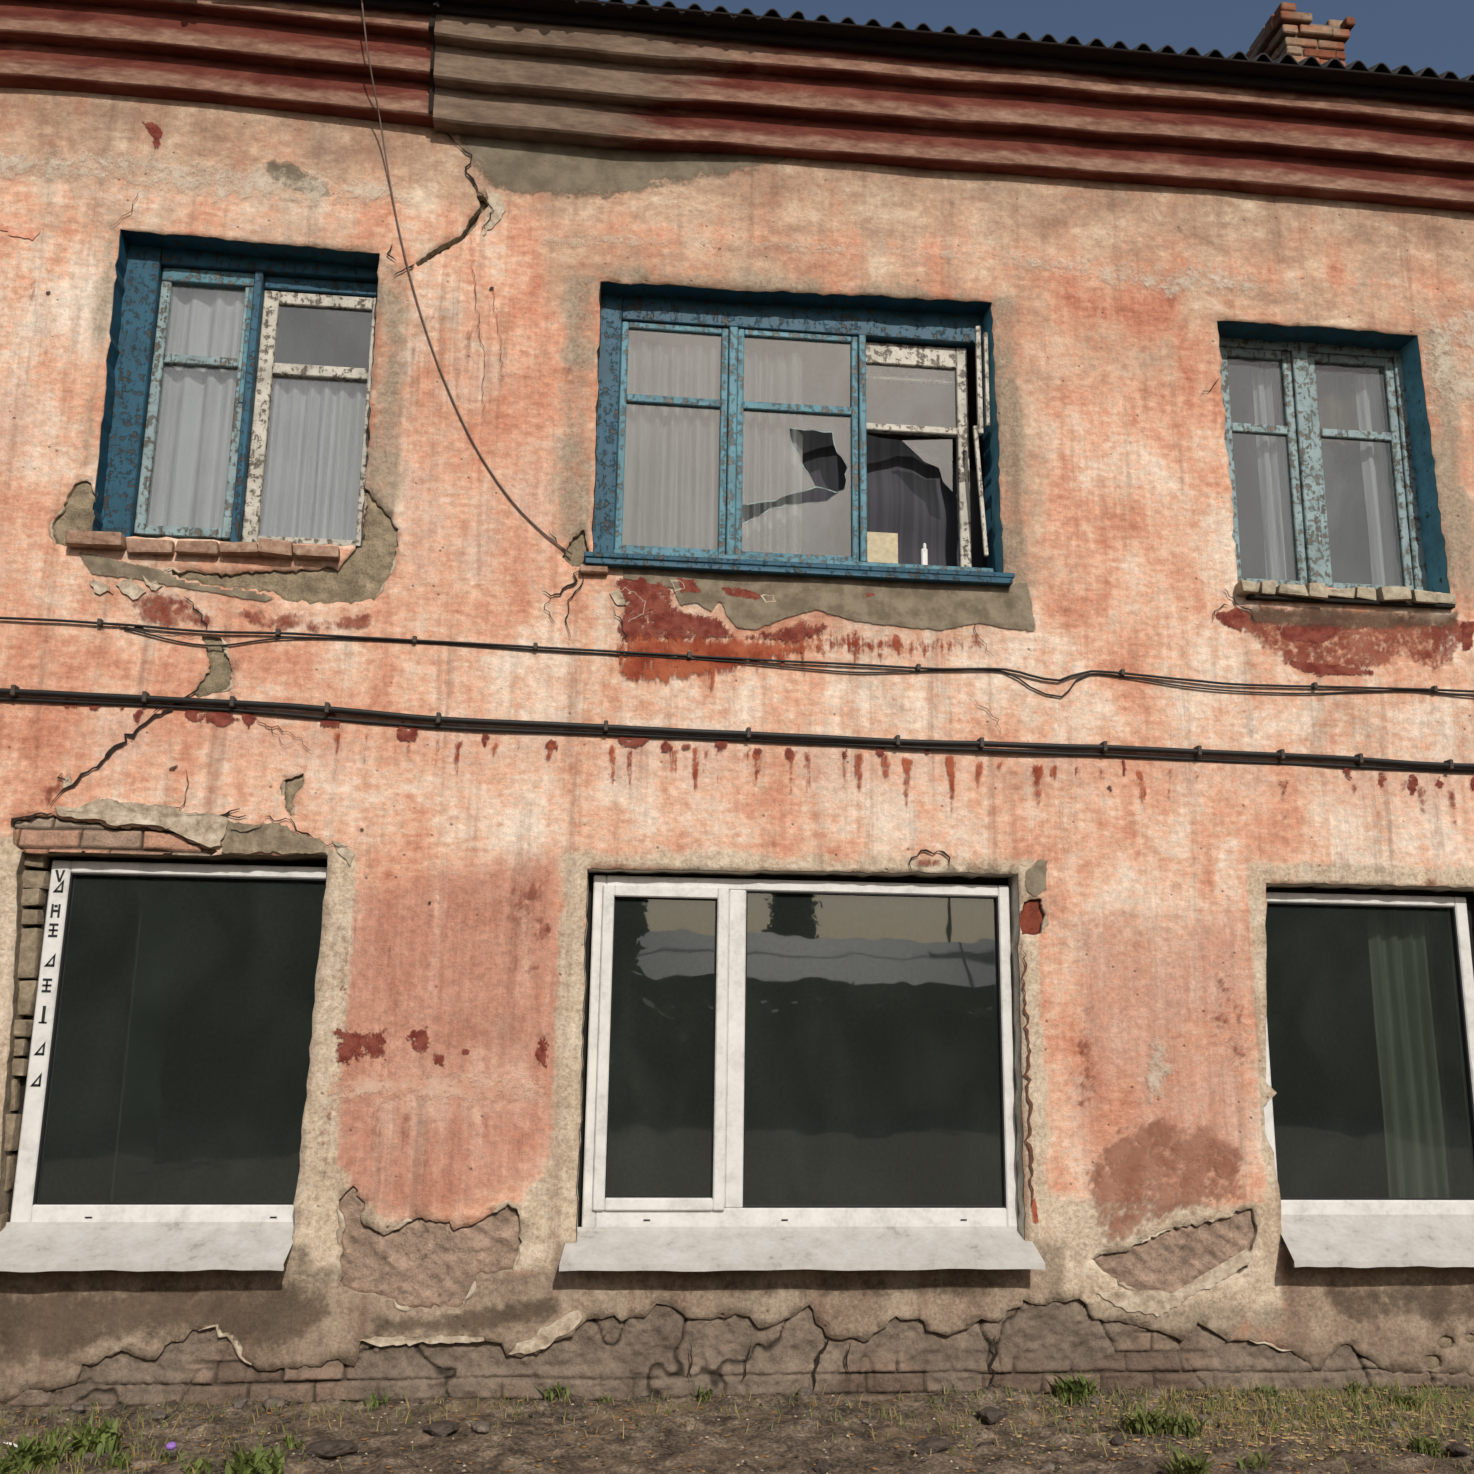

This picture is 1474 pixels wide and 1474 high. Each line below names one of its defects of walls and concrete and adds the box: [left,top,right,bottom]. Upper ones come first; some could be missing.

crack [387,13,504,424]
crack [119,597,208,637]
spalling [89,490,399,728]
peeling [610,577,828,643]
peeling [1216,604,1474,677]
crack [11,689,199,825]
spalling [14,775,326,856]
crack [175,771,348,847]
spalling [336,1185,522,1313]
spalling [1093,1209,1255,1294]
spalling [359,1335,484,1347]
spalling [508,1310,582,1355]